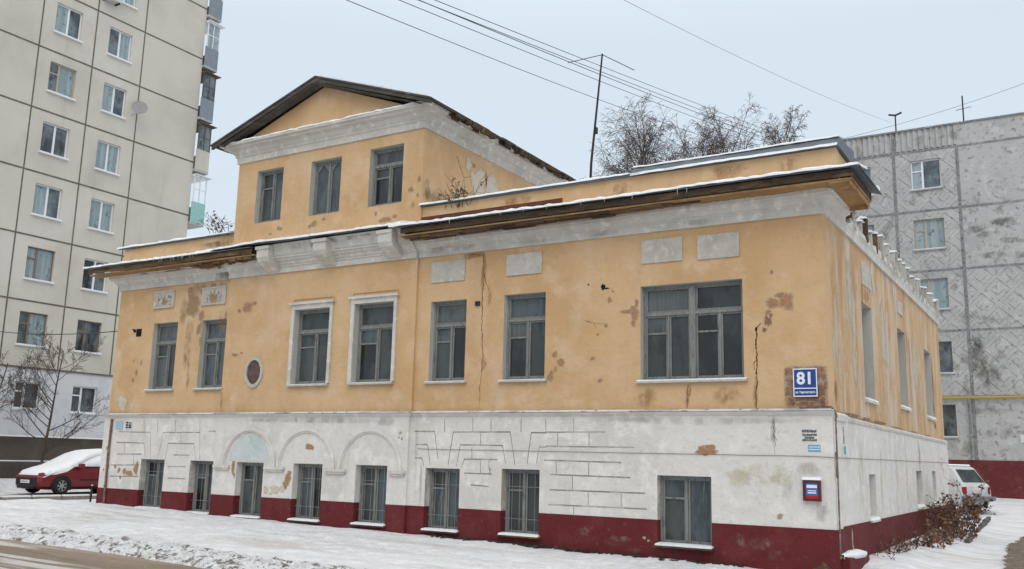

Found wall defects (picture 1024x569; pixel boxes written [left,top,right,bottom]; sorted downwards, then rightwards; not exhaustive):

flaking render [466,156,499,195]
flaking render [184,287,219,346]
crack [465,254,489,401]
flaking render [588,284,639,327]
flaking render [755,292,794,341]
crack [753,323,761,404]
flaking render [103,461,139,479]
flaking render [264,470,292,495]
flaking render [695,444,718,456]